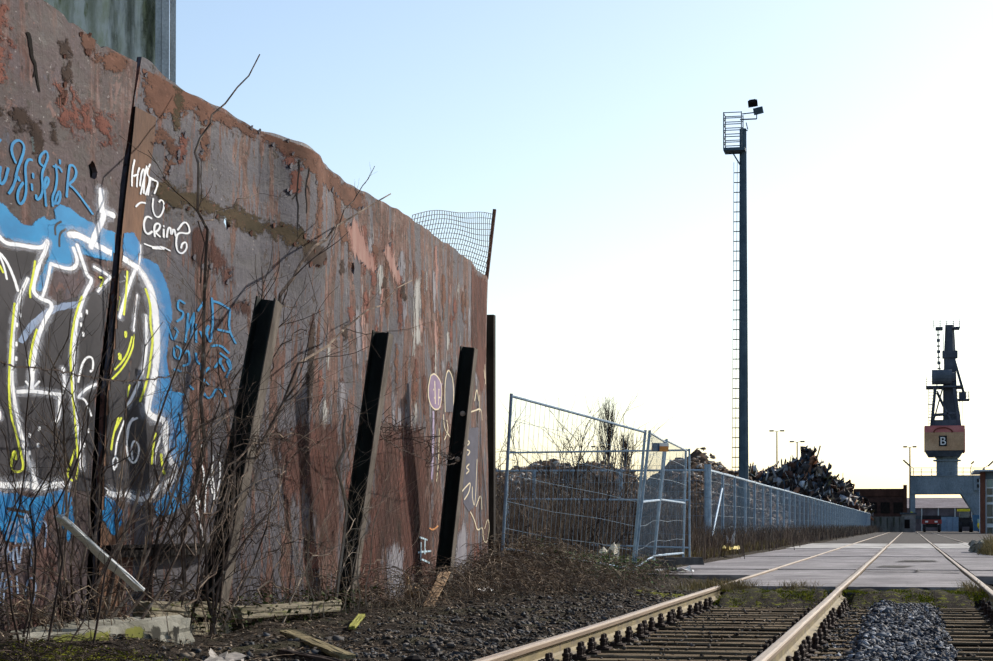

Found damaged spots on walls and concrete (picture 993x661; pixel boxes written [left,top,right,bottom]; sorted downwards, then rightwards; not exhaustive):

rust [51,81,119,151]
rust [152,156,487,601]